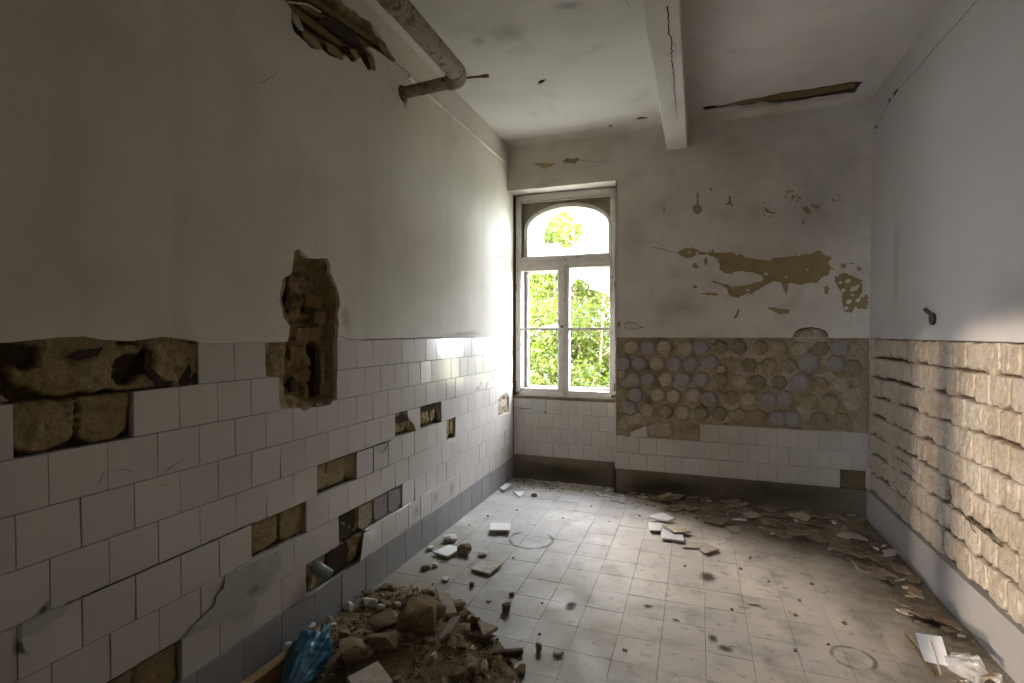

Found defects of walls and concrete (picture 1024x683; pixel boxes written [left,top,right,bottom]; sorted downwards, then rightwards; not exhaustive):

spalling [285,0,396,71]
crack [666,6,677,118]
peeling [653,247,870,321]
spalling [265,250,337,410]
peeling [0,336,198,457]
peeling [395,402,454,439]
spalling [498,393,509,415]
peeling [316,453,355,493]
peeling [616,321,1024,629]
peeling [251,502,303,557]
peeling [306,485,401,592]
crack [184,577,225,638]